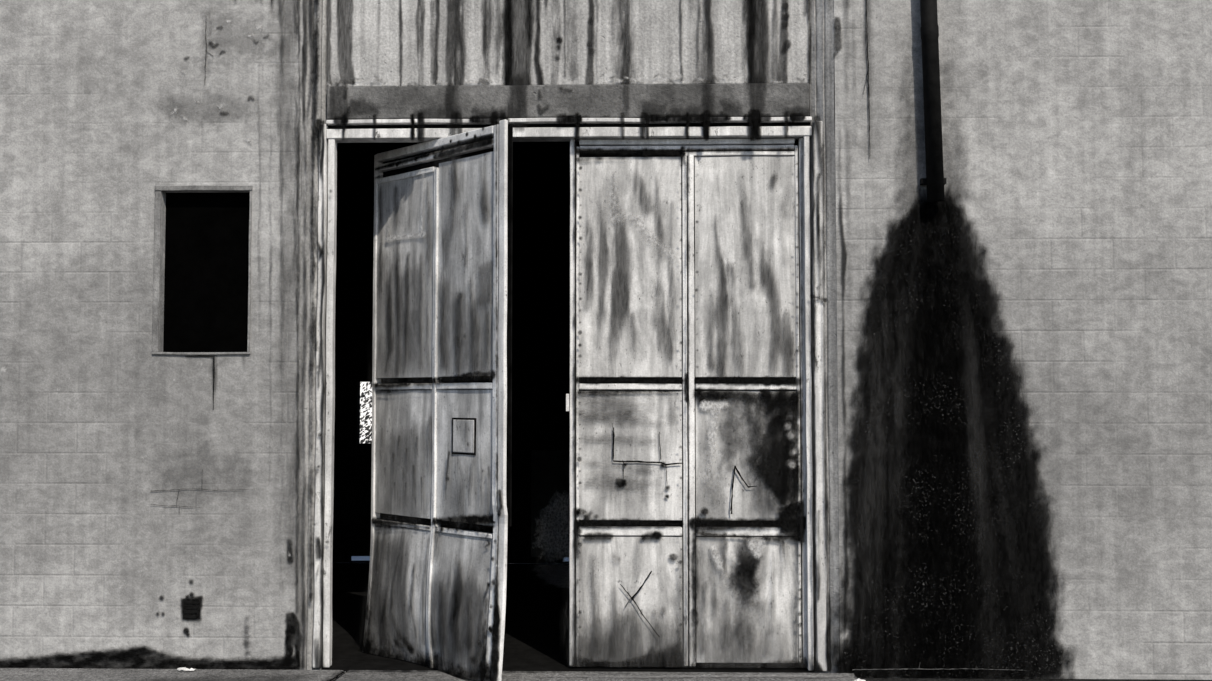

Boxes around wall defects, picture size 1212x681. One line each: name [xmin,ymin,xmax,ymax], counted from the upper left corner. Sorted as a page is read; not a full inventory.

water stain [417,0,465,114]
water stain [483,0,594,128]
water stain [613,0,633,85]
water stain [697,0,714,111]
water stain [743,0,791,122]
water stain [806,0,816,84]
crack [185,355,215,410]
water stain [789,97,1073,679]